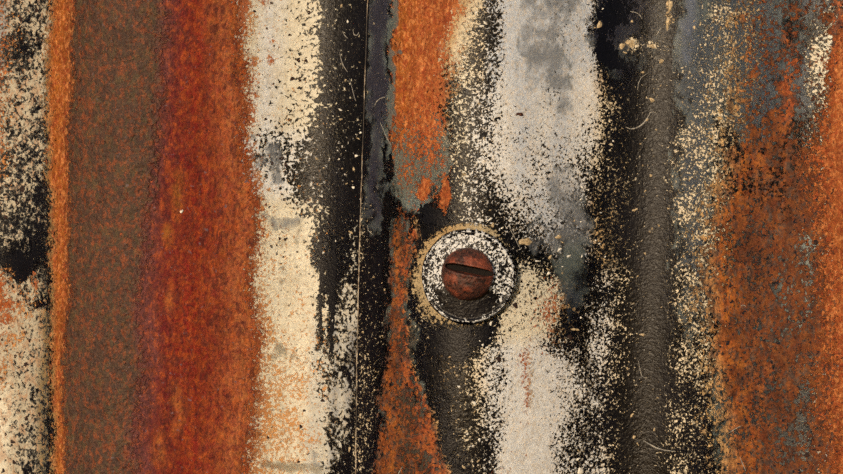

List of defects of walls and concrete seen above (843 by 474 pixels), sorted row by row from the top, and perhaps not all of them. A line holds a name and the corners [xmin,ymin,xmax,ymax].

rust [0,0,344,474]
rust [371,0,532,474]
rust [680,0,843,474]